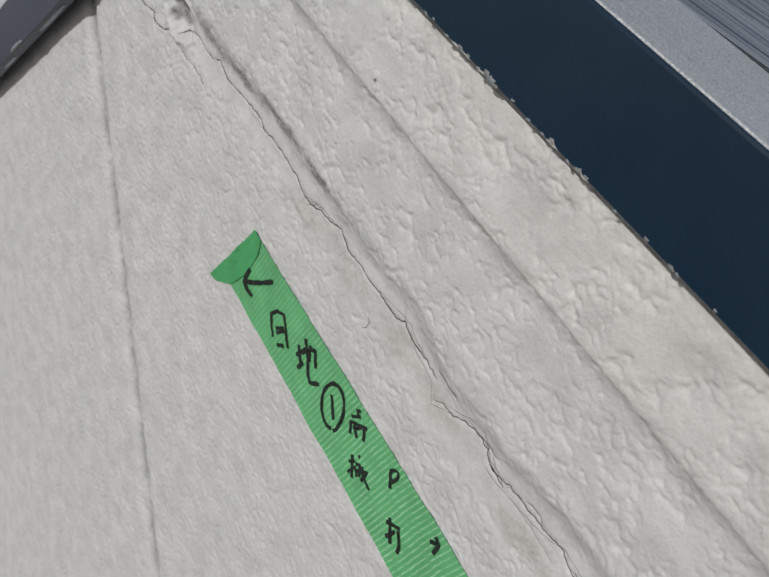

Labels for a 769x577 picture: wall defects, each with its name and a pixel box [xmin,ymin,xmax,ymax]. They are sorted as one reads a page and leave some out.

crack [142,0,582,577]